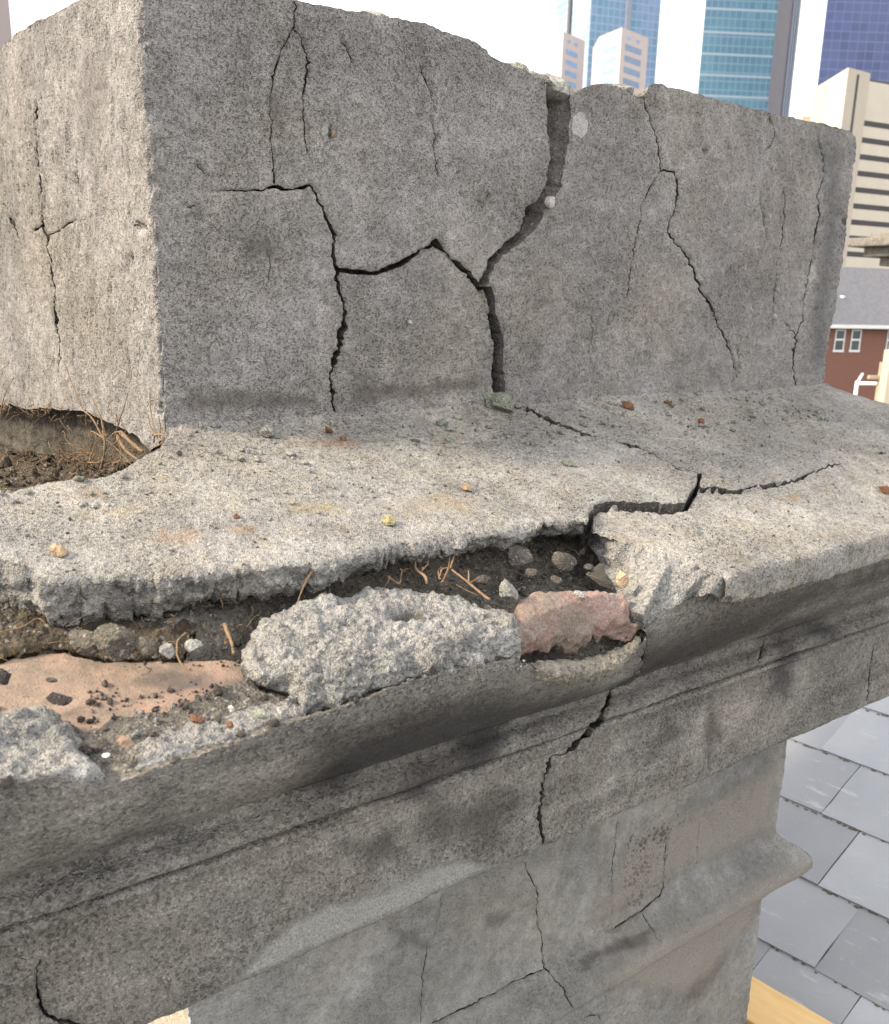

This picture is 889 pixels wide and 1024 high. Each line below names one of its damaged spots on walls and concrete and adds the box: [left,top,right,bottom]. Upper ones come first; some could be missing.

crack [2,105,77,365]
crack [187,1,571,411]
crack [627,104,739,377]
crack [759,139,825,386]
spalling [0,520,587,628]
crack [526,407,840,555]
damp [305,694,593,801]
crack [420,629,647,1024]
crack [610,820,664,940]